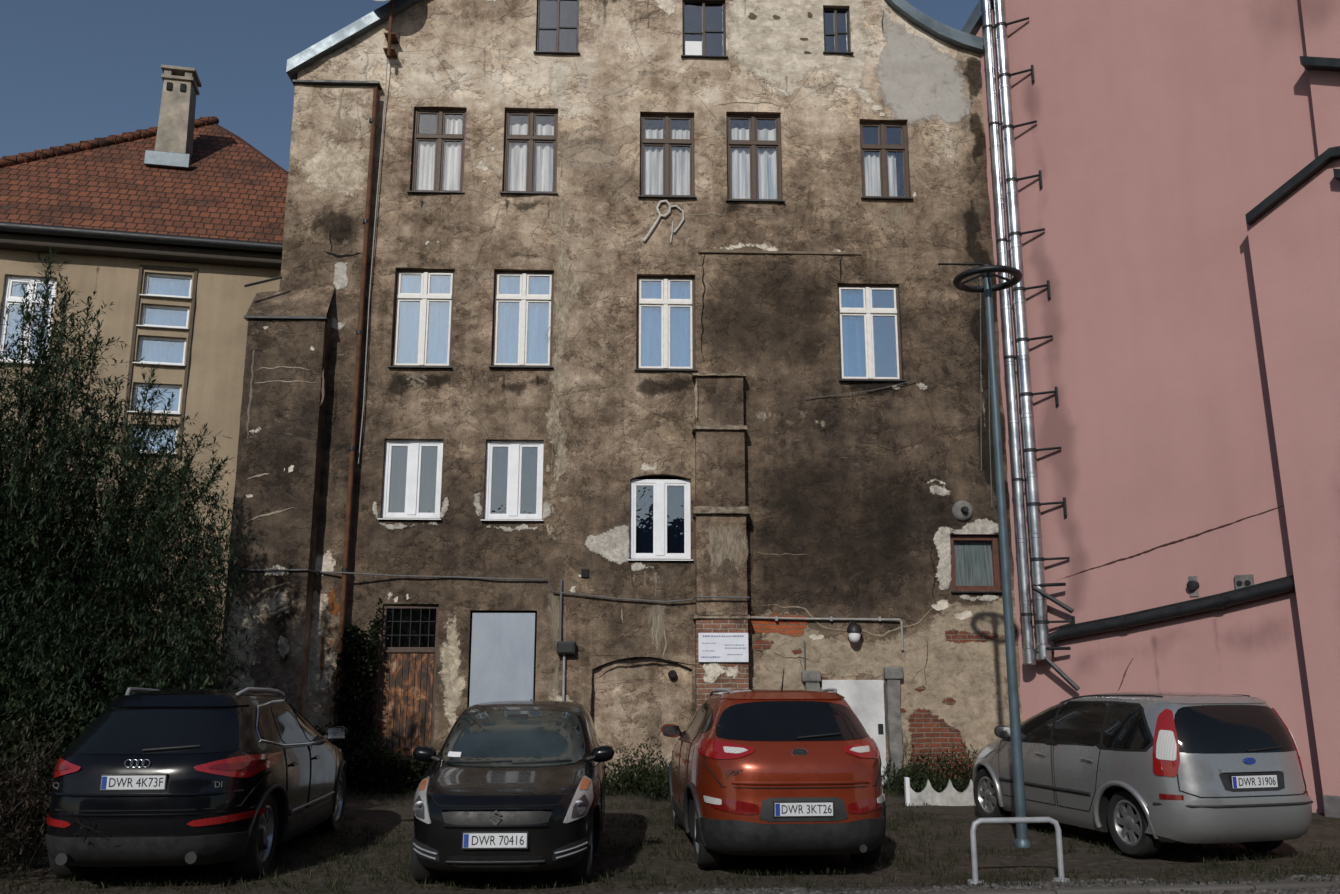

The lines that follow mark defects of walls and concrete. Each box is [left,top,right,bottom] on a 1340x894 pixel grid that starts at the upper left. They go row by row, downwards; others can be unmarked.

spalling [220,565,294,695]
peeling [438,615,467,732]
spalling [703,593,1010,786]